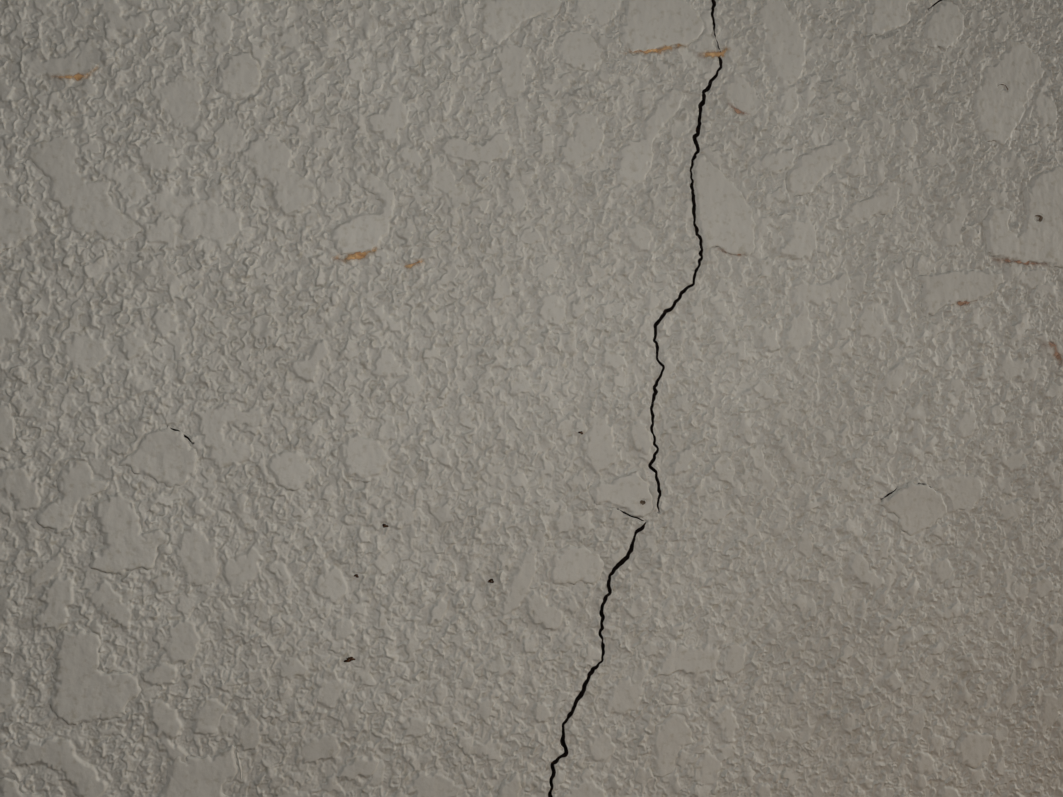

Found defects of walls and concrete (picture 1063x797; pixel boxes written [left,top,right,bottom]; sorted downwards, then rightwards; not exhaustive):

crack [546,0,724,797]